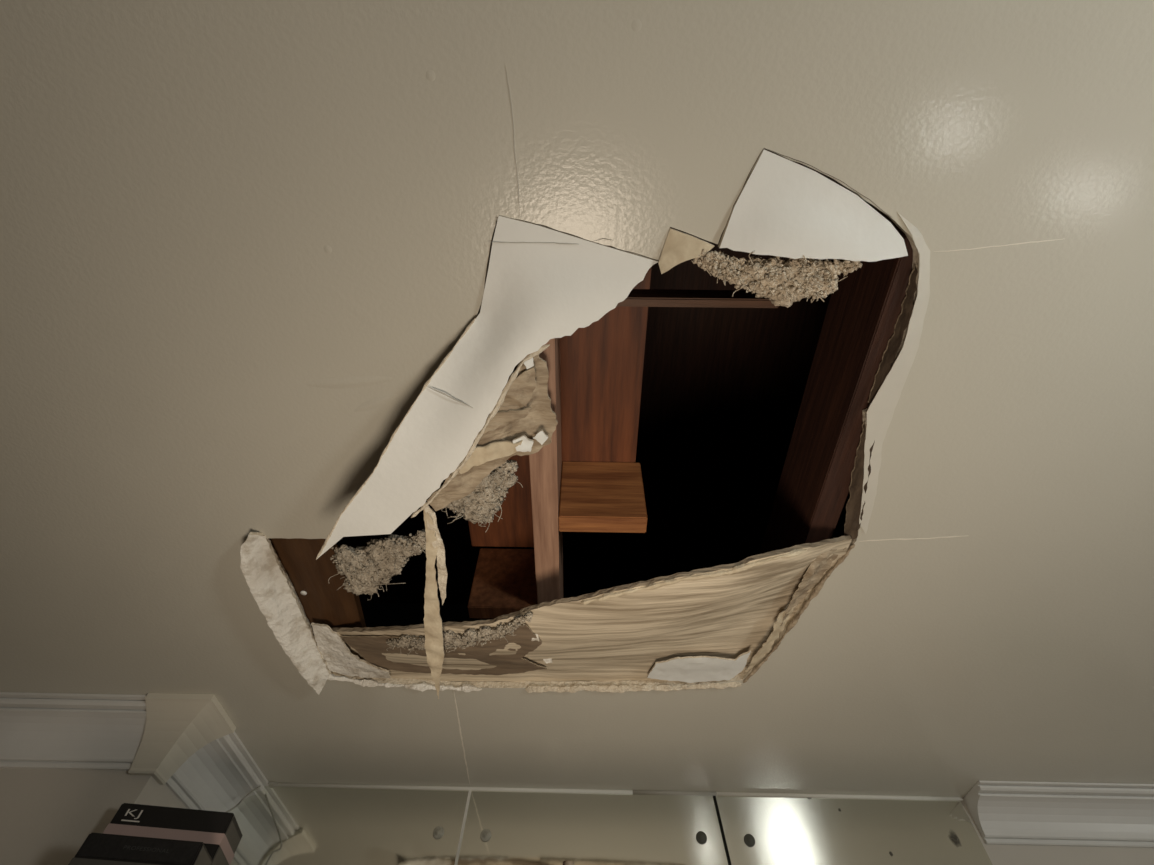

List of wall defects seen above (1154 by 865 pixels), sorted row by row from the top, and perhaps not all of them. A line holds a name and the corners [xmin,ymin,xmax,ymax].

crack [495,65,656,260]
peeling [859,212,930,534]
peeling [311,623,391,678]
peeling [647,650,751,683]